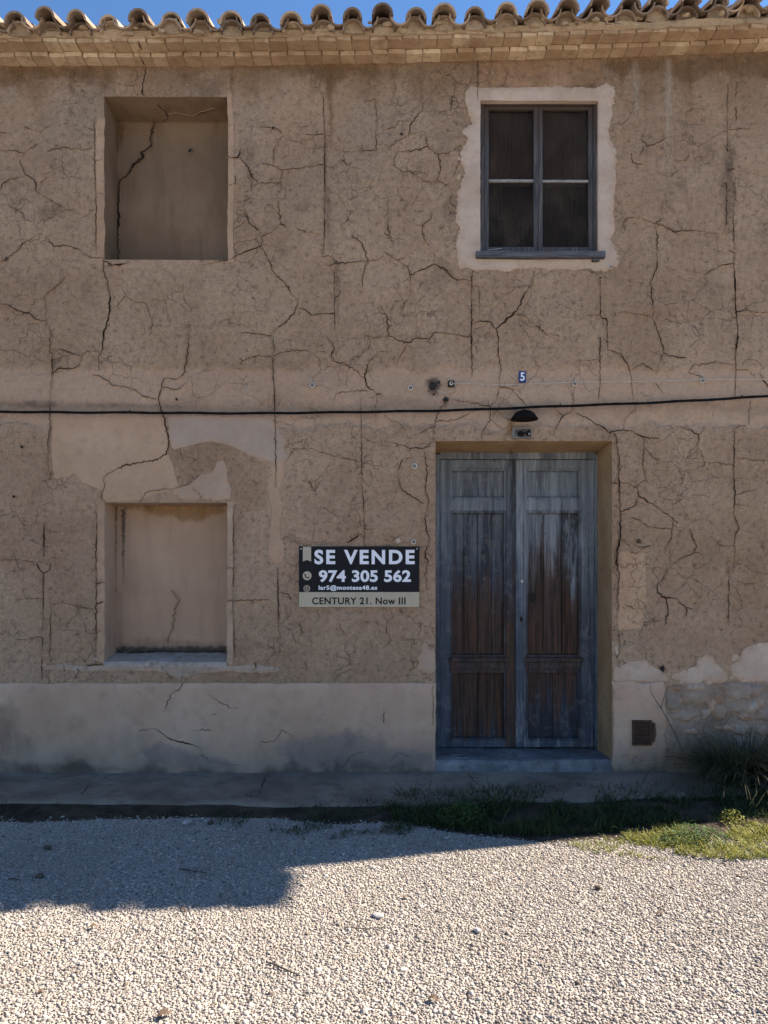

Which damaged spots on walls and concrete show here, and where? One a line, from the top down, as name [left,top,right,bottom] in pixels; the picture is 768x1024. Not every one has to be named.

crack [450,60,479,110]
crack [0,41,215,680]
crack [204,92,560,589]
crack [554,83,768,658]
spalling [174,442,268,513]
crack [224,505,345,671]
spalling [613,642,768,773]